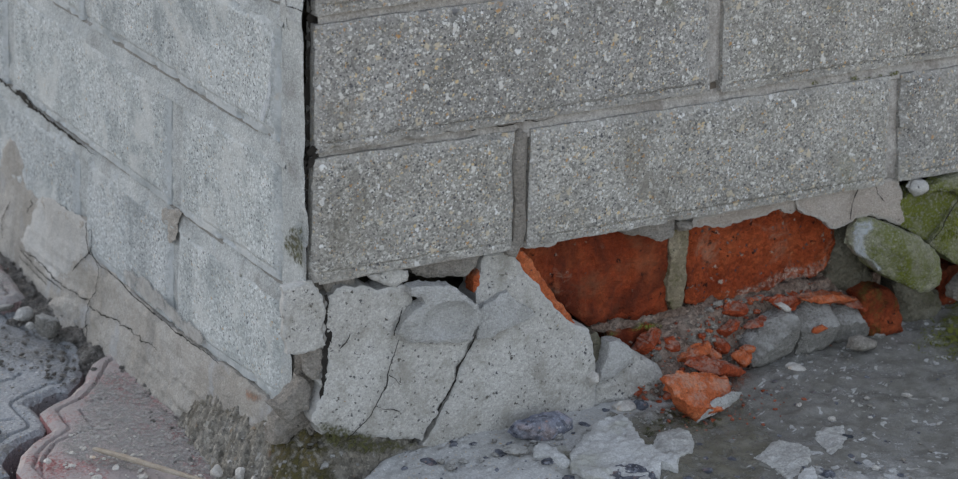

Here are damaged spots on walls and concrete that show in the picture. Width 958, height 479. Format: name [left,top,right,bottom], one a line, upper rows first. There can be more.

crack [285,0,318,216]
peeling [21,198,90,280]
peeling [618,220,675,242]
peeling [687,178,904,229]
crack [319,294,350,399]
crack [343,308,403,442]
crack [426,335,476,429]